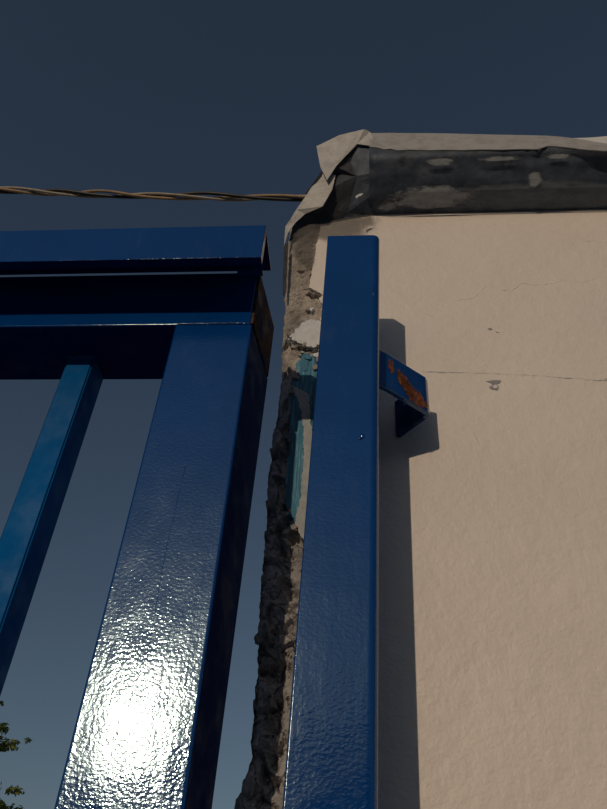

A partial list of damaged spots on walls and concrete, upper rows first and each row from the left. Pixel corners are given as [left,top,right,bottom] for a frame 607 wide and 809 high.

spalling [234,229,322,809]
rust [388,359,428,408]